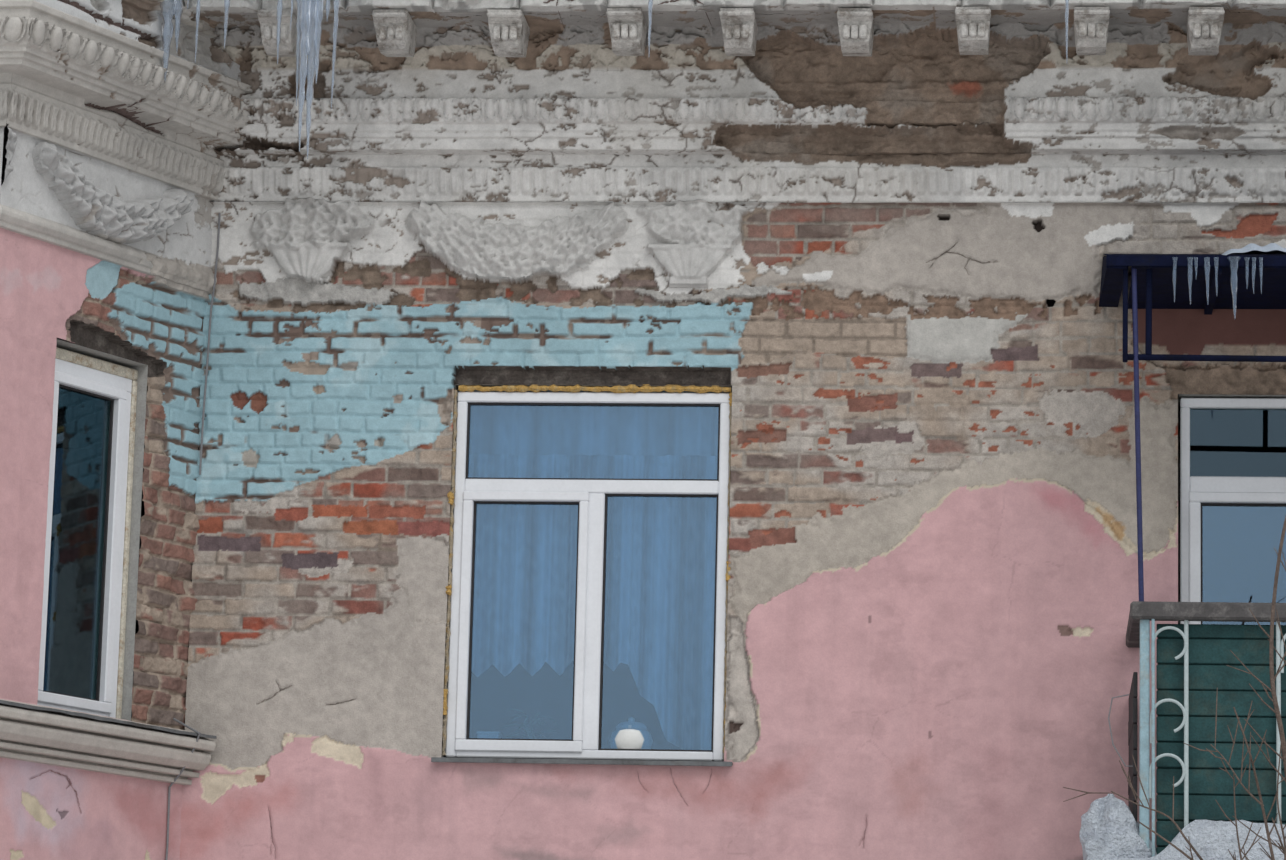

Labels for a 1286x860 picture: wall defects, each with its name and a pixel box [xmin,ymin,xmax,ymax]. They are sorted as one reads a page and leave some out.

flaking render [62,202,1286,804]